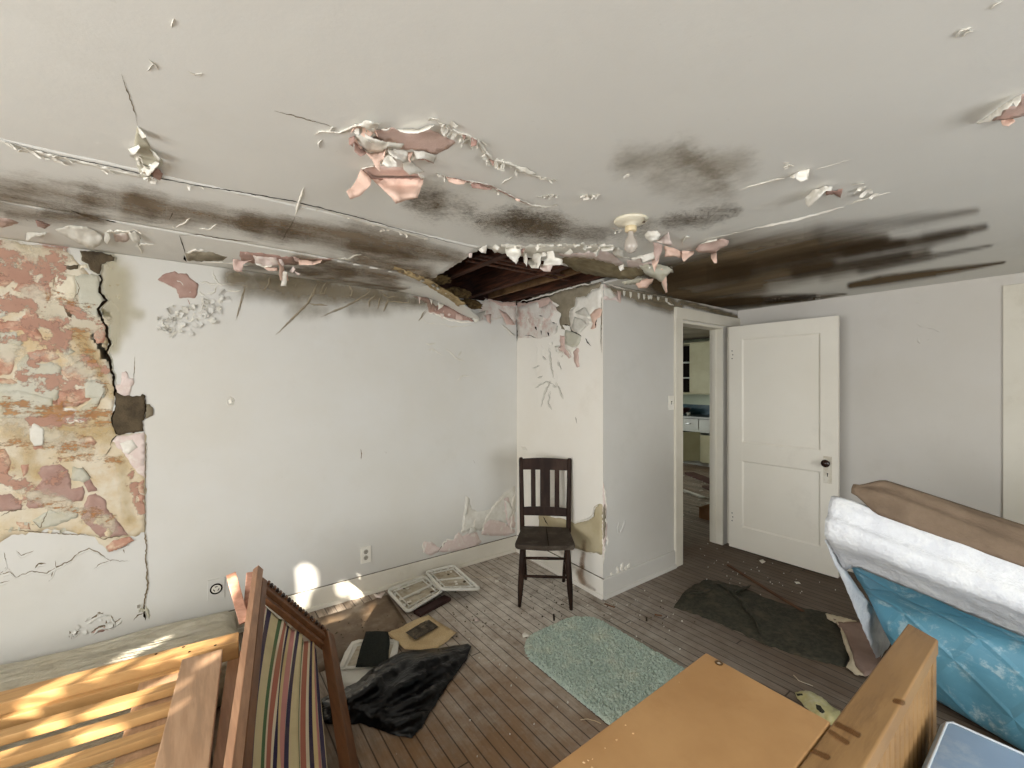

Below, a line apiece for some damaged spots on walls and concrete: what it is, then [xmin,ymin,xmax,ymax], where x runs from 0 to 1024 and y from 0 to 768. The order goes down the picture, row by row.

peeling [121,74,163,180]
peeling [277,111,558,208]
water stain [0,183,459,304]
peeling [179,234,362,286]
water stain [477,210,598,240]
peeling [394,159,890,367]
water stain [608,226,1004,318]
peeling [0,217,153,552]
crack [97,274,135,453]
crack [527,345,577,423]
crack [0,444,150,639]
peeling [539,483,630,575]